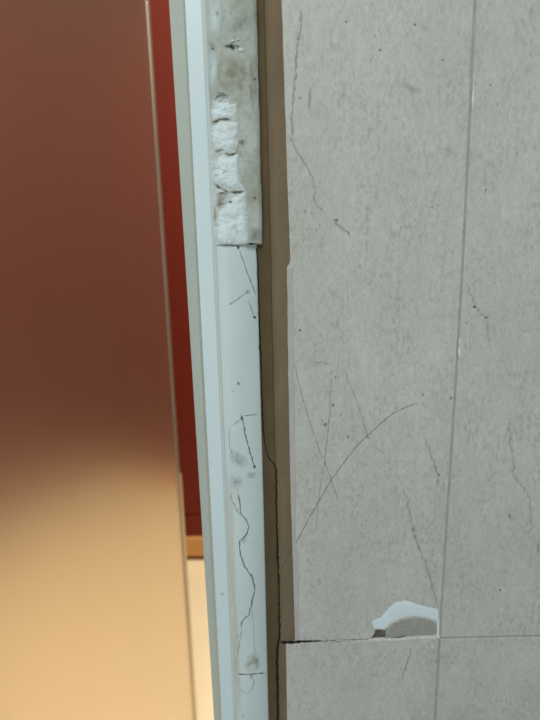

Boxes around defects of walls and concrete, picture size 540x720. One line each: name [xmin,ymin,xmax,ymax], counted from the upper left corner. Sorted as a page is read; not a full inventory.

flaking render [206,0,262,246]
crack [225,243,353,720]
spalling [368,600,440,640]